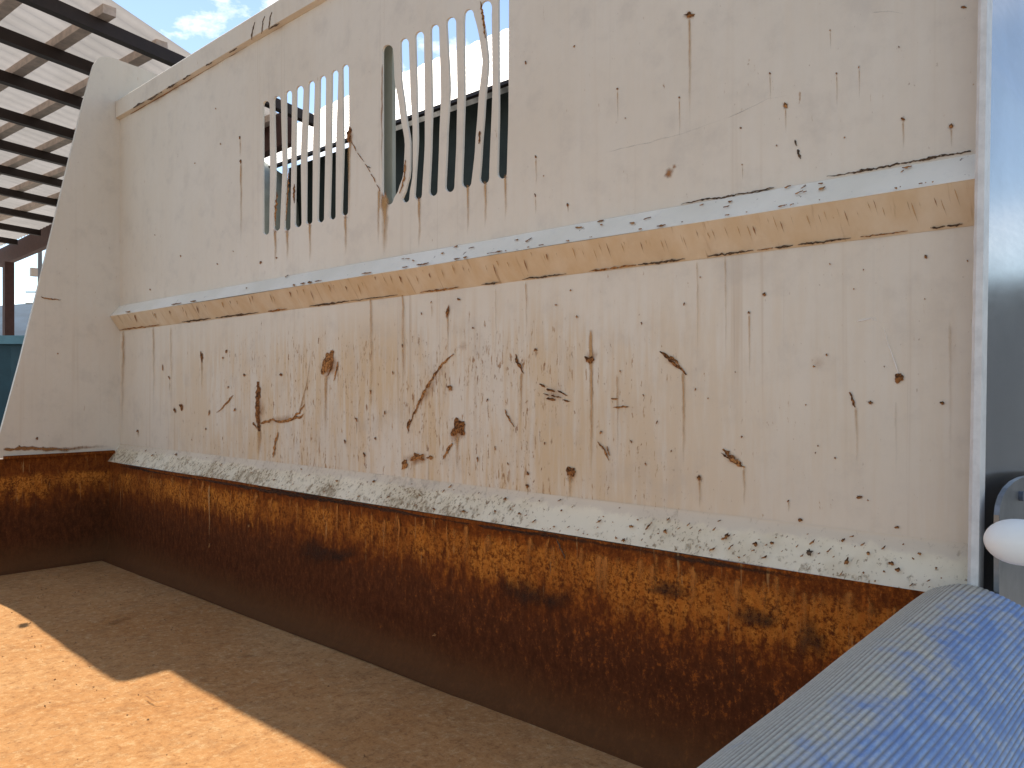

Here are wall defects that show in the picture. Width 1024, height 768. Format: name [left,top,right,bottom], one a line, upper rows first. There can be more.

corrosion [378,192,387,233]
corrosion [321,350,338,403]
peeling [884,337,904,384]
corrosion [401,417,465,470]
corrosion [124,466,778,626]